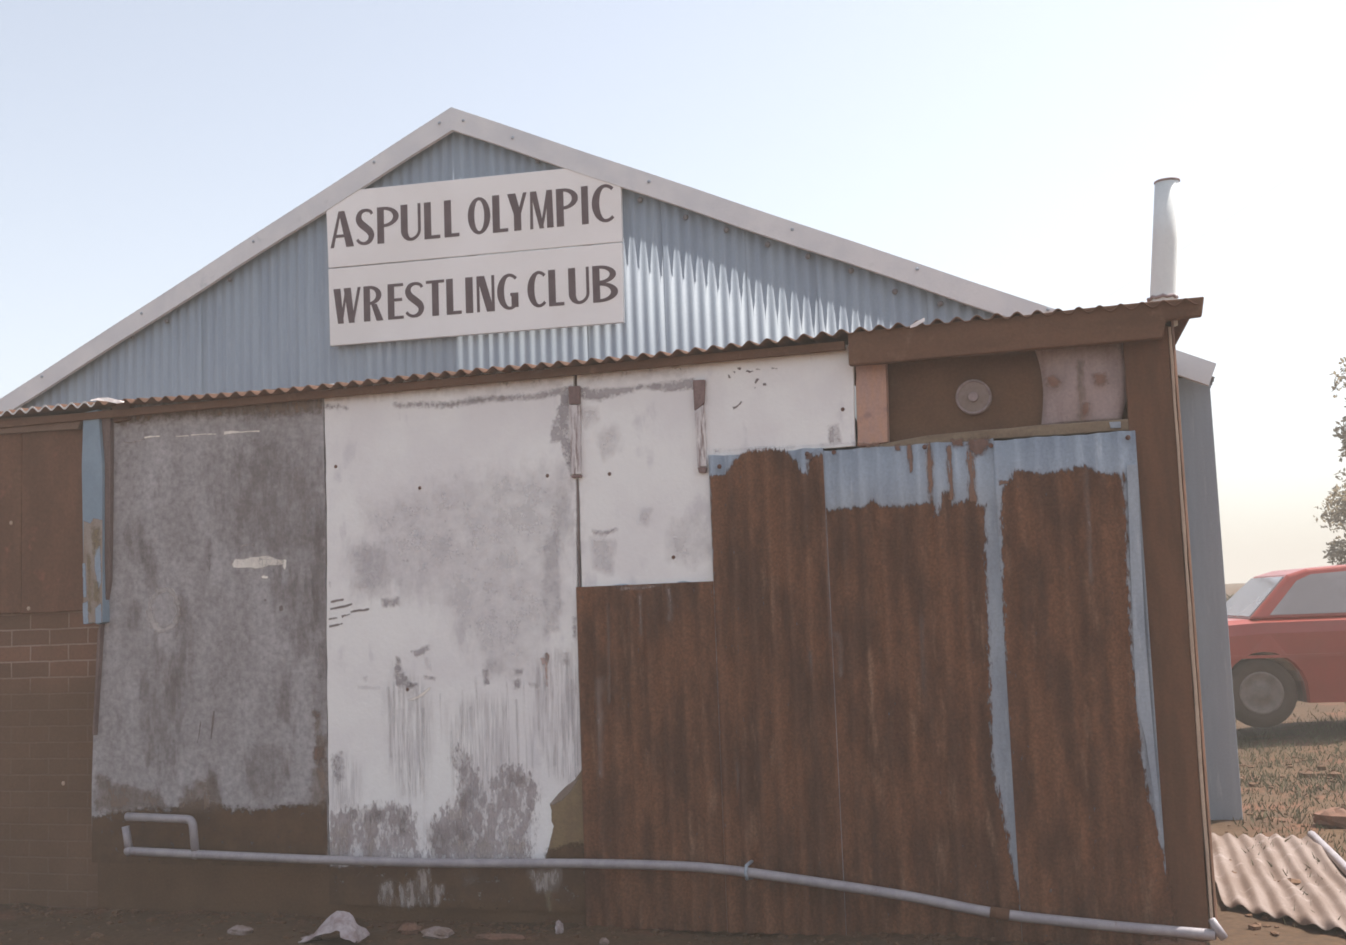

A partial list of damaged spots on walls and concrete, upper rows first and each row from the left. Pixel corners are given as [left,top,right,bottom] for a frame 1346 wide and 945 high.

leakage [398,379,693,466]
rust [576,438,1177,945]